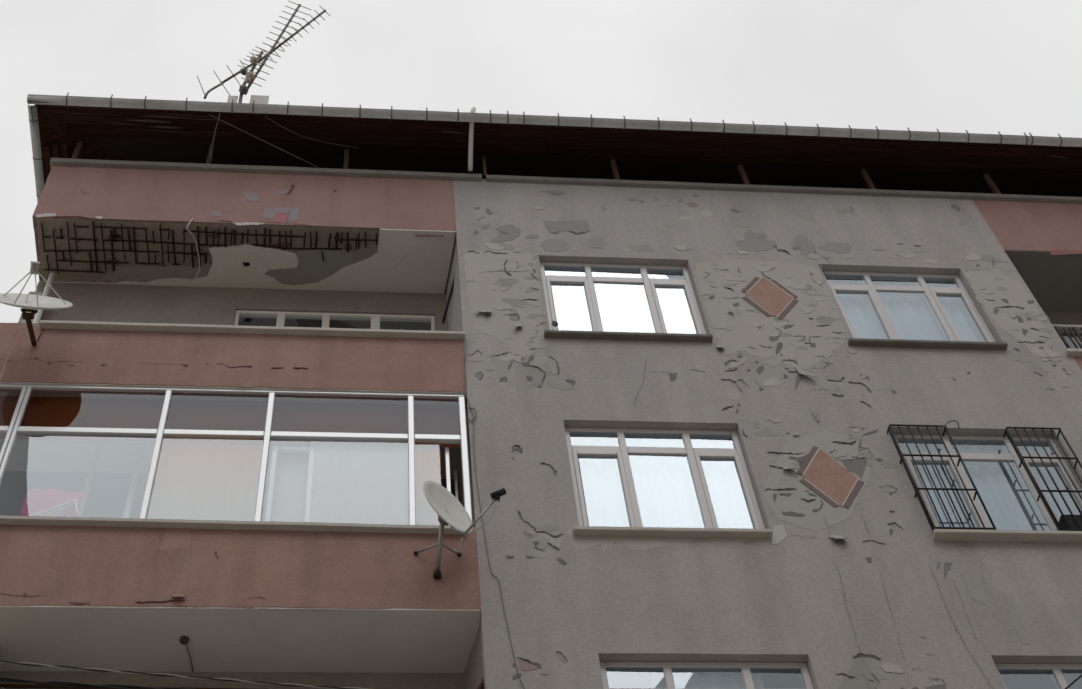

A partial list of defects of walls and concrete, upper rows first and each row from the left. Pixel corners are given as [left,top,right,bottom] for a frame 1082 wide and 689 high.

spalling [36,185,379,285]
peeling [463,207,590,388]
peeling [692,245,861,391]
peeling [965,264,1057,367]
peeling [762,429,883,545]
peeling [838,652,880,689]